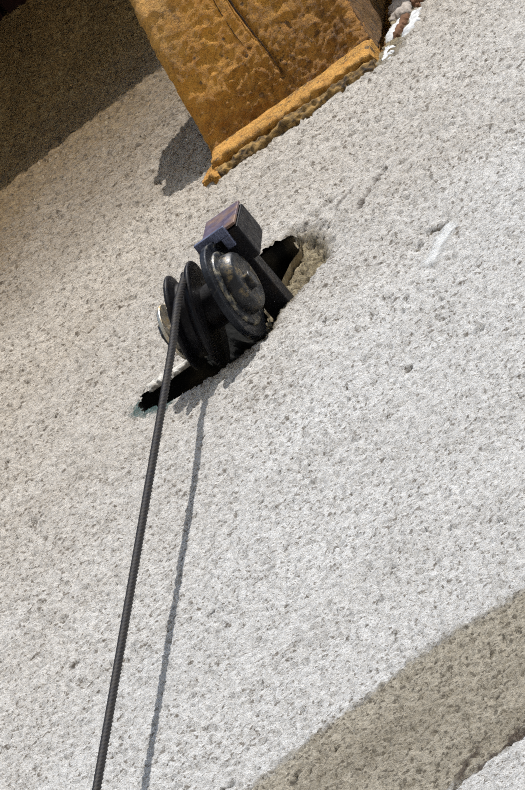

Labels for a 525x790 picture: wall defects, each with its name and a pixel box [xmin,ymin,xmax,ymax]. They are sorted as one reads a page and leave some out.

spalling [261,233,328,305]
spalling [138,308,277,413]